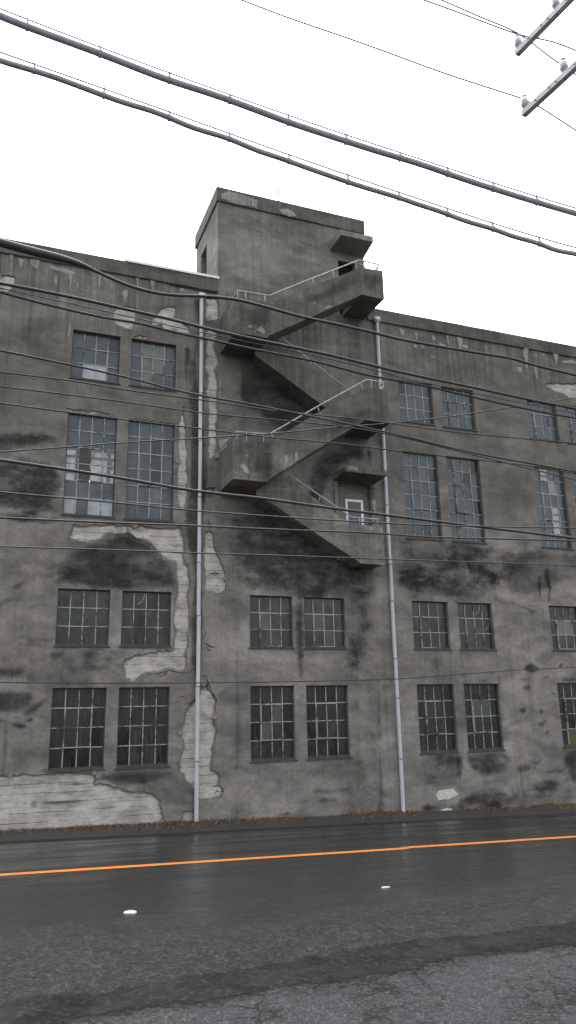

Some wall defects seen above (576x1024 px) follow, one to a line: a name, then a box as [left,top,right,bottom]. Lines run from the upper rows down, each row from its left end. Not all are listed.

spalling [113,306,147,340]
spalling [152,305,191,334]
spalling [204,298,221,459]
damp [0,435,48,445]
damp [0,464,58,521]
damp [65,537,171,588]
spalling [202,531,227,594]
damp [400,545,515,596]
spalling [66,522,192,683]
crack [145,630,215,705]
spalling [176,683,224,822]
spalling [0,771,165,831]